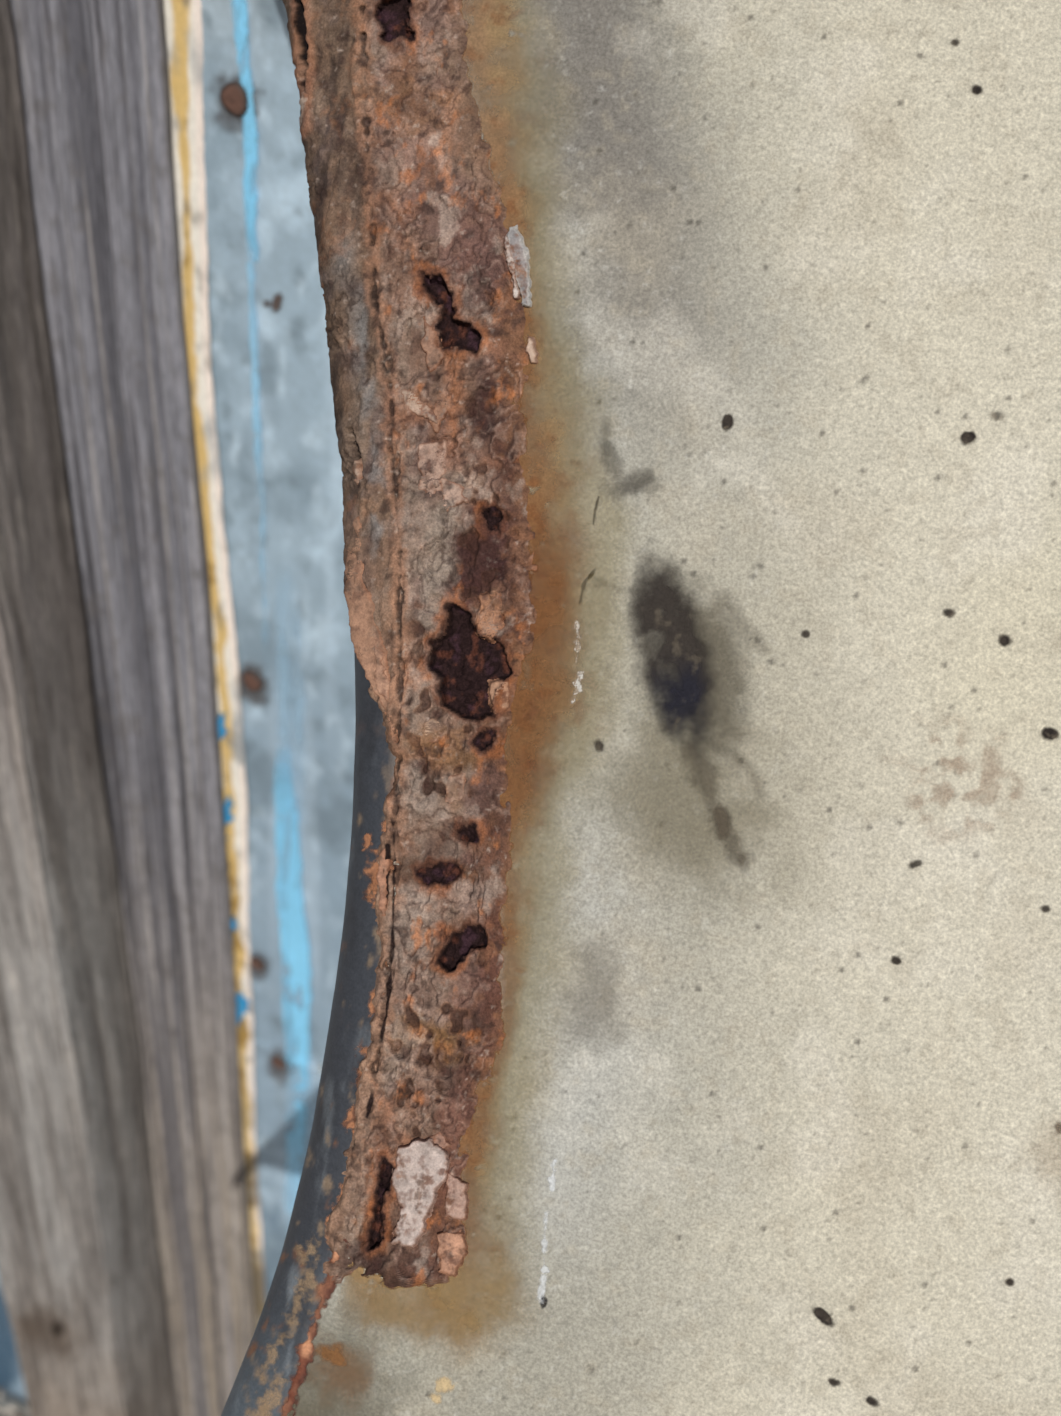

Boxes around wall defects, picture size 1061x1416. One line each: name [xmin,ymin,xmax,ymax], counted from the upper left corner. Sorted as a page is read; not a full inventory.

corrosion [264,294,282,312]
corrosion [239,666,266,703]
corrosion [282,0,582,1416]
water stain [713,807,731,839]